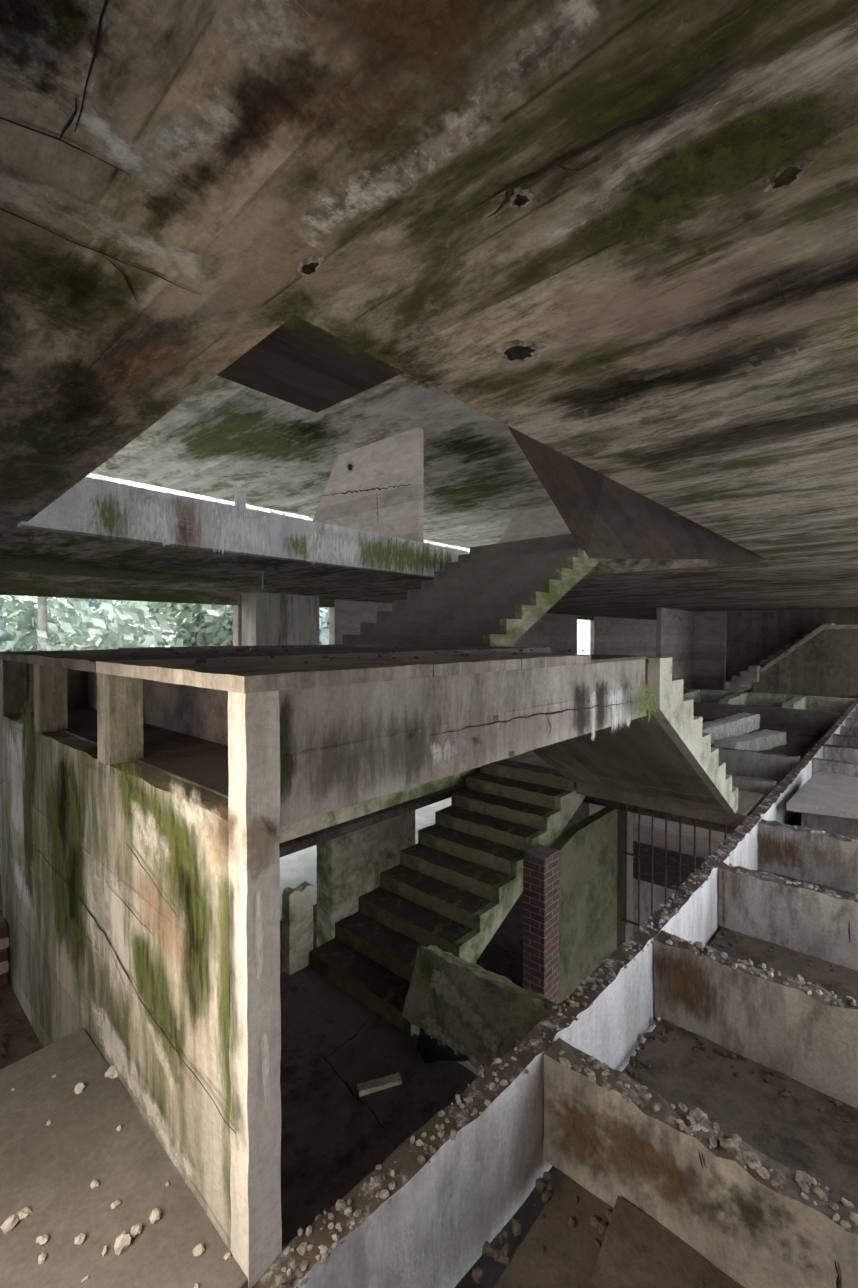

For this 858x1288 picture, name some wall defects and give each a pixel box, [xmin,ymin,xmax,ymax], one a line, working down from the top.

crack [0,0,130,175]
leakage [535,0,858,239]
leakage [305,167,413,243]
spalling [763,157,815,192]
spalling [494,340,546,364]
leakage [482,255,858,419]
leakage [646,400,858,466]
corrosion [177,502,200,550]
crack [431,702,627,736]
leakage [573,682,631,738]
leakage [9,730,25,841]
leakage [59,762,180,1077]